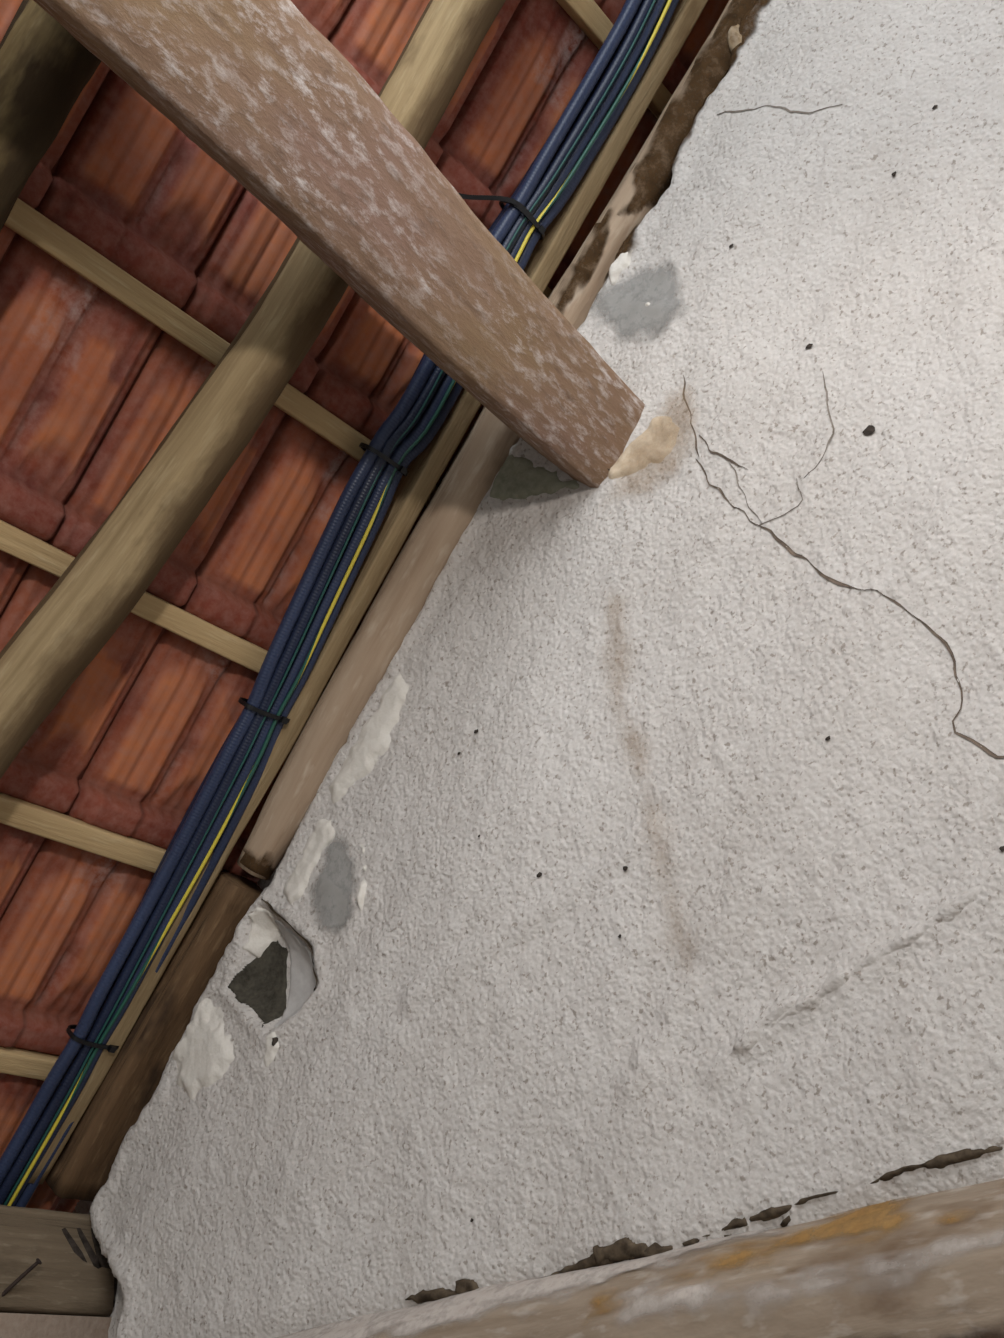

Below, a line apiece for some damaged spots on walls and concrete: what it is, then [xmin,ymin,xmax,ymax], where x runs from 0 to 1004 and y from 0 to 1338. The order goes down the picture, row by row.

damp [556,0,770,312]
crack [683,371,1004,758]
damp [240,849,273,880]
flaking render [228,819,367,1067]
peeling [711,1200,905,1268]